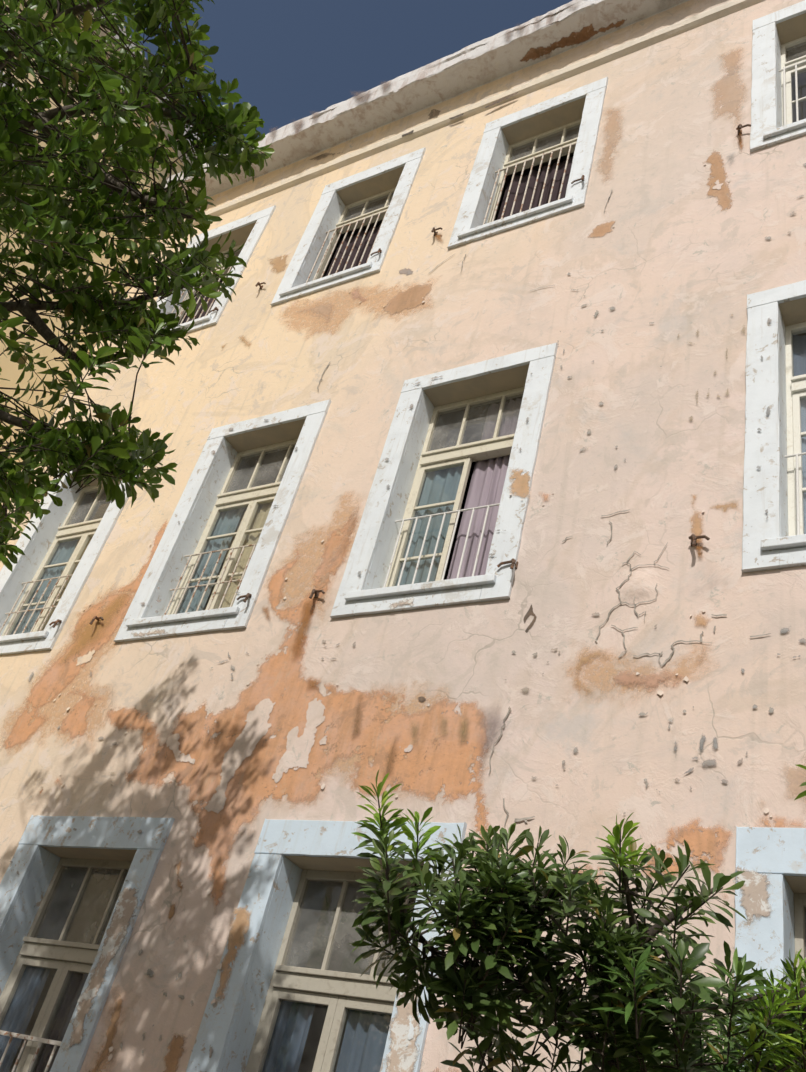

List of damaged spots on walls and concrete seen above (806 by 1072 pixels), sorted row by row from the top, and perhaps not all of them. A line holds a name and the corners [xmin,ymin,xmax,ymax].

spalling [520,19,627,62]
peeling [704,151,732,211]
peeling [285,268,431,335]
peeling [509,470,530,500]
crack [595,510,727,666]
peeling [3,496,488,904]
peeling [644,820,730,884]
peeling [733,866,771,922]
peeling [67,880,138,1048]
peeling [211,906,250,1005]
peeling [142,1025,193,1072]
peeling [385,971,458,1072]